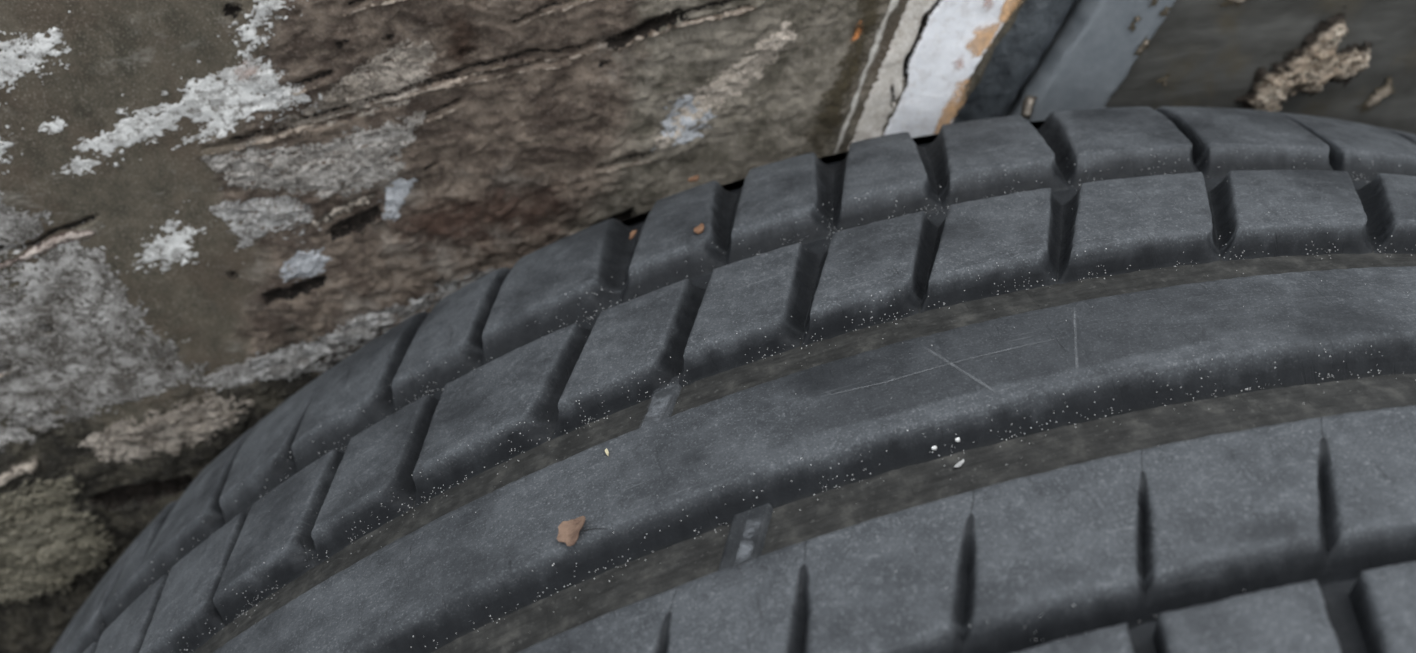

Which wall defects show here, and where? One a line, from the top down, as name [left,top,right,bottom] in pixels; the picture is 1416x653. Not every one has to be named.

spalling [1128,0,1171,56]
spalling [1234,6,1374,112]
spalling [1356,77,1396,114]